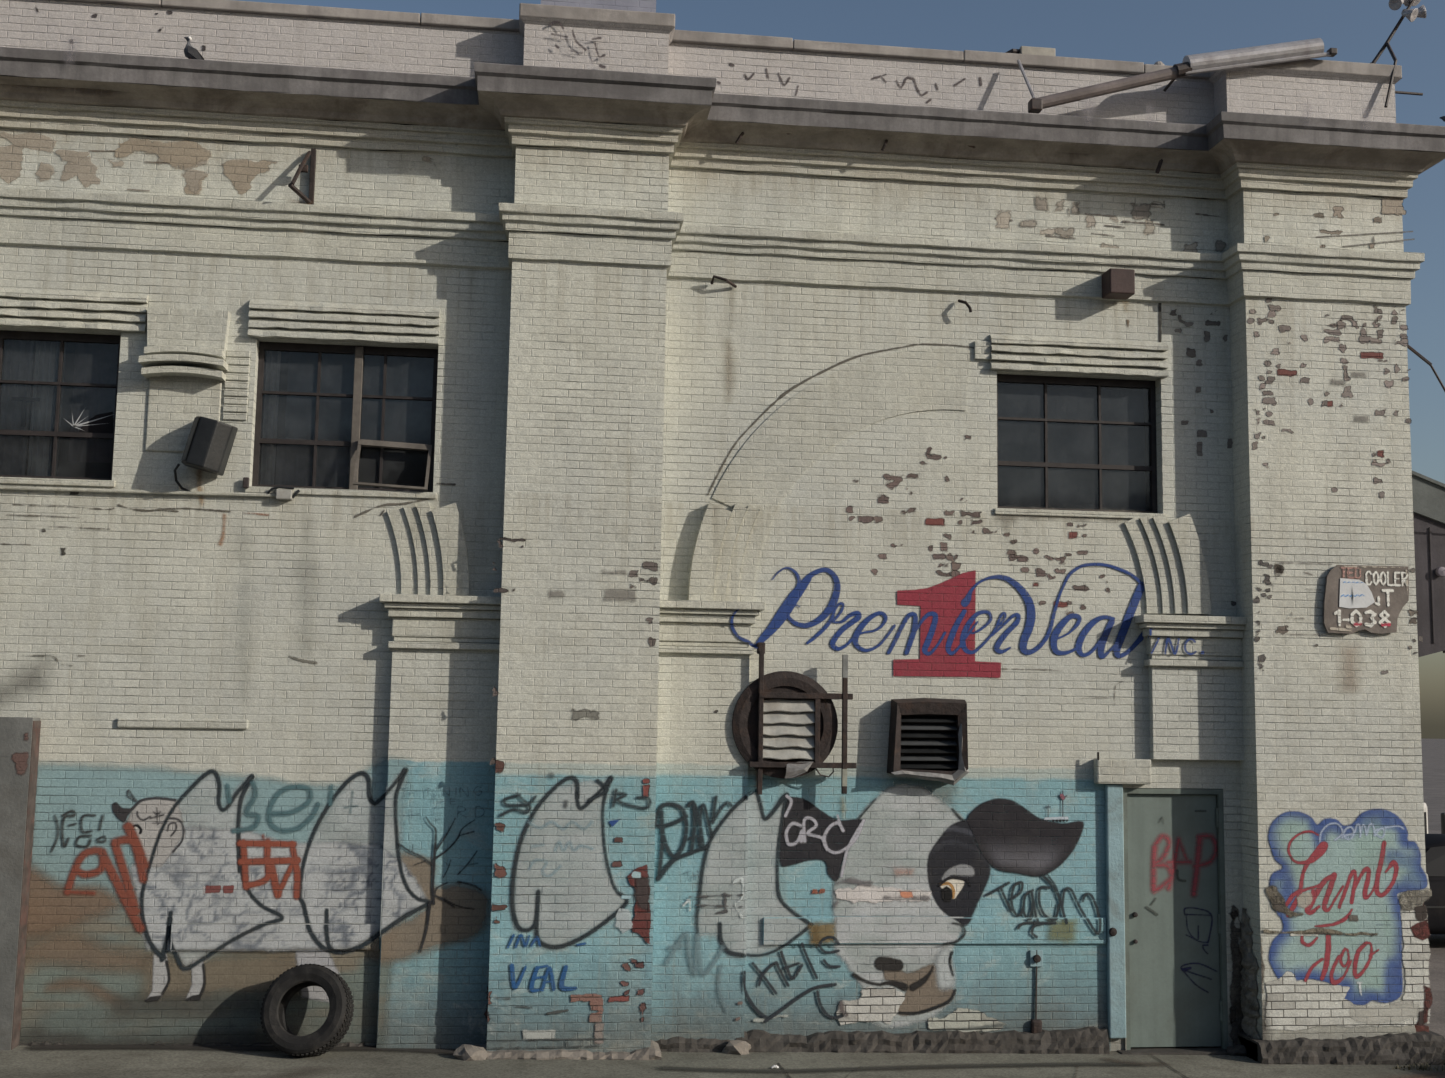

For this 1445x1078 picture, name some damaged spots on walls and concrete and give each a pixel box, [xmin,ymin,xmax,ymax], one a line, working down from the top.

peeling [0,132,277,195]
peeling [995,196,1165,248]
peeling [1313,197,1415,249]
peeling [1170,309,1228,366]
peeling [1247,298,1412,468]
peeling [1372,450,1391,498]
peeling [846,447,1110,615]
peeling [491,904,508,923]
flaking render [612,860,651,944]
flaking render [1229,886,1433,1046]
flaking render [484,958,647,1049]
flaking render [836,986,905,1025]